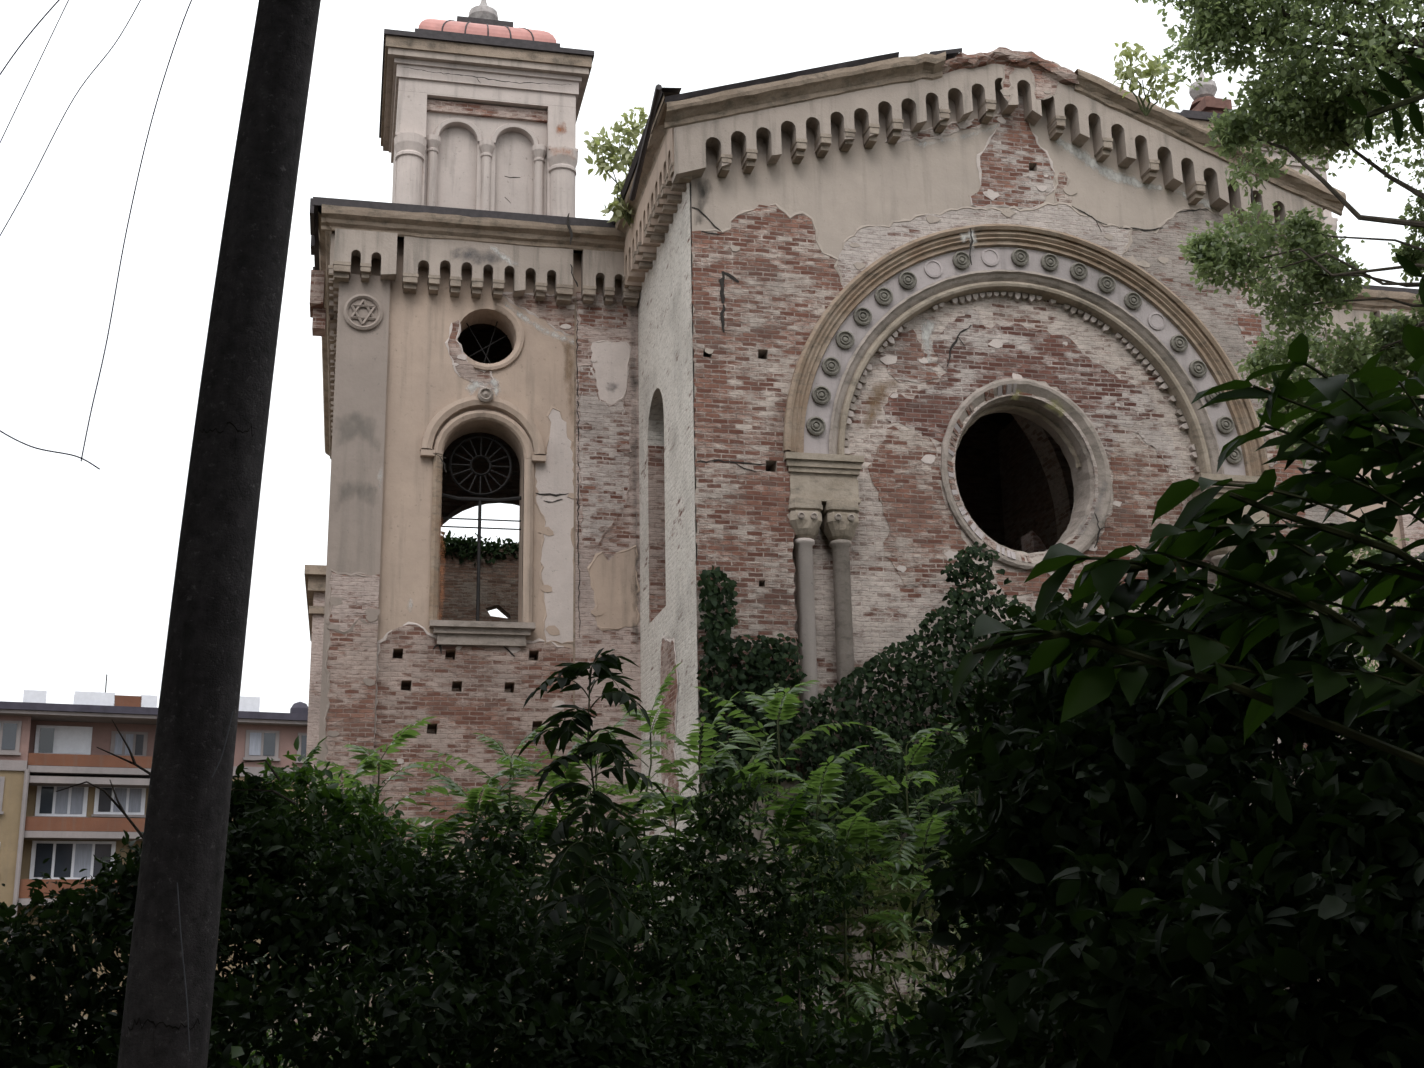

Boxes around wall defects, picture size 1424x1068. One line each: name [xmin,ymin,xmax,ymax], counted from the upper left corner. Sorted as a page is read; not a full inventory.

crack [1072,206,1208,232]
spalling [445,320,500,390]
peeling [502,292,631,353]
peeling [691,60,1347,786]
peeling [322,353,640,848]
peeling [659,636,680,798]